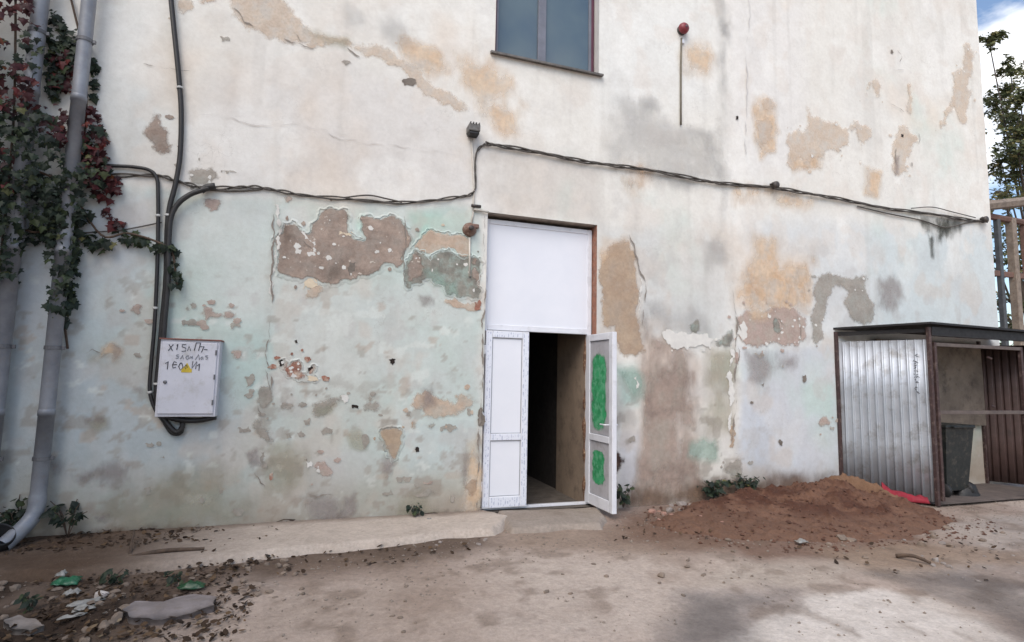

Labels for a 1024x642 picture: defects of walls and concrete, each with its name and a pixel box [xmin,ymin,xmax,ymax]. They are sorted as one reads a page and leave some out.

peeling [232,0,465,110]
peeling [940,43,977,128]
peeling [145,115,178,167]
peeling [754,99,871,173]
peeling [866,126,920,196]
peeling [182,299,242,330]
crack [265,204,282,390]
flaking render [270,200,485,311]
peeling [599,235,647,355]
flaking render [662,273,875,367]
water stain [921,219,961,256]
peeling [238,349,481,510]